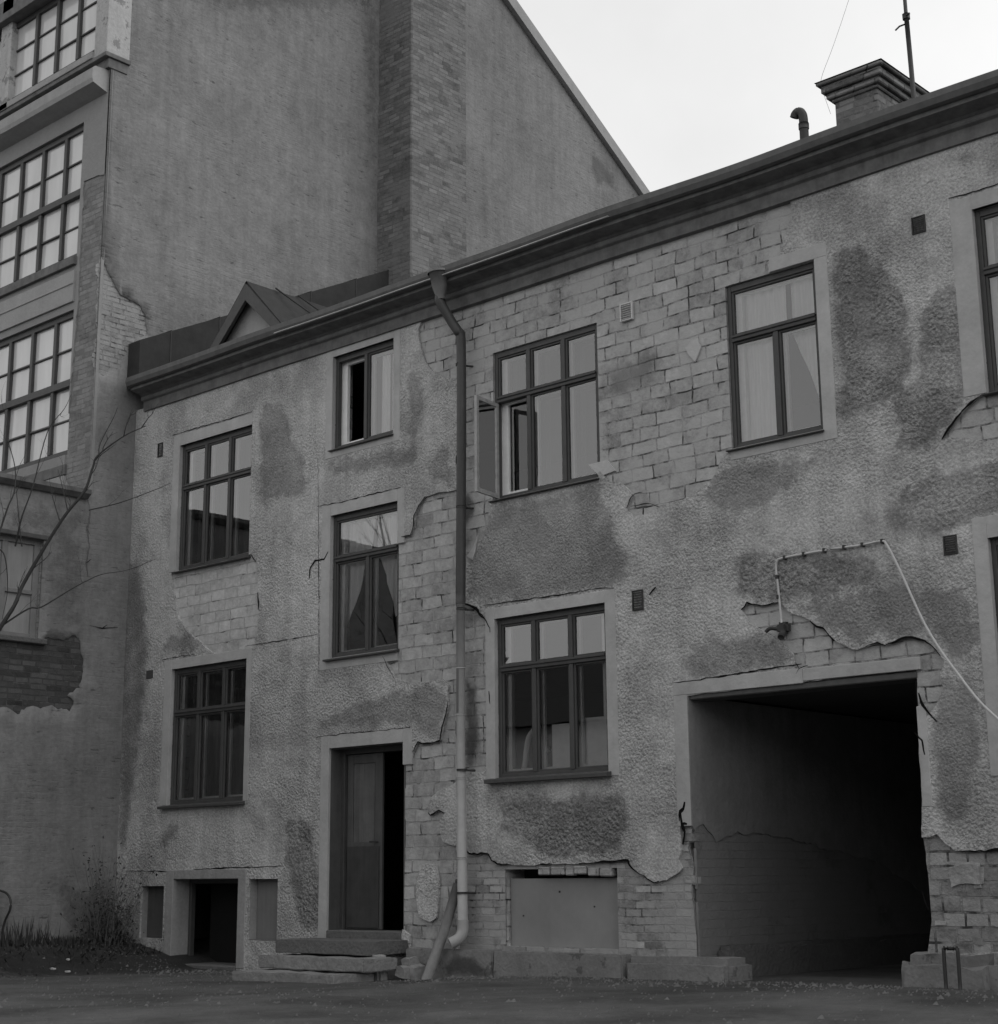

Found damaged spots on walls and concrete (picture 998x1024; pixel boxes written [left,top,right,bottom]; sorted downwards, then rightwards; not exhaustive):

spalling [65,175,147,489]
crack [942,393,984,439]
spalling [0,635,83,714]
spalling [166,555,259,653]
spalling [330,203,811,957]
spalling [686,553,979,713]
spalling [923,835,998,954]